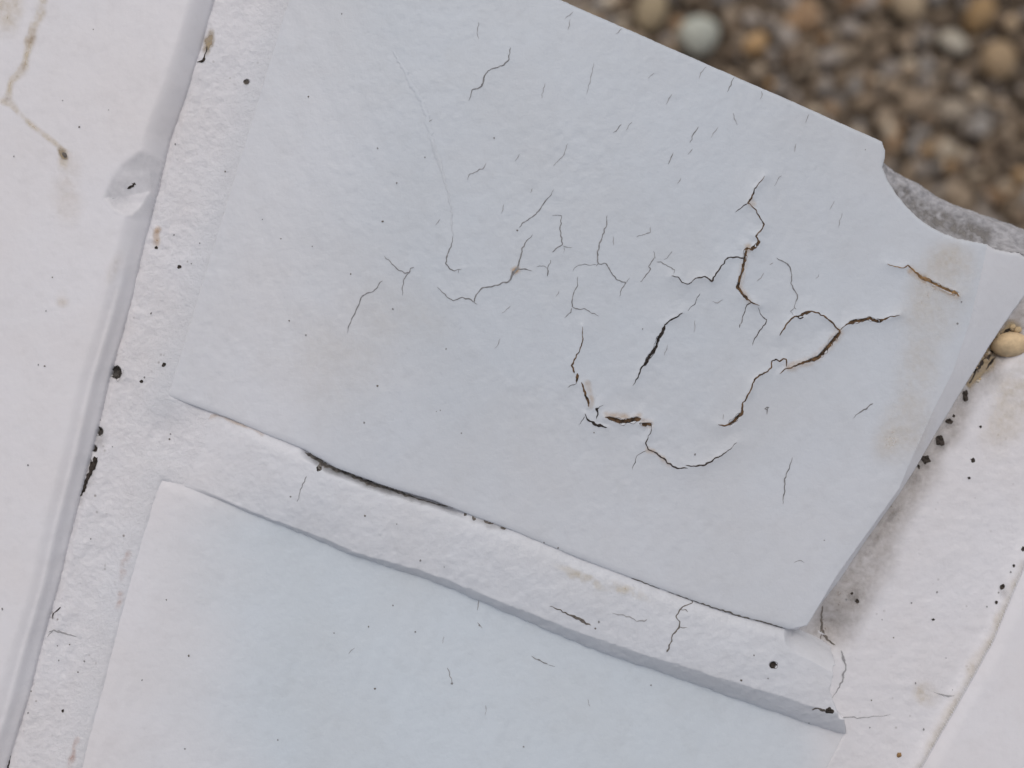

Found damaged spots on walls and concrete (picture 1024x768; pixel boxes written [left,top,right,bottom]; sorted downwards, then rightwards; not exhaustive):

peeling [198,35,213,63]
crack [347,257,414,332]
crack [436,176,899,469]
crack [888,264,960,297]
crack [632,578,783,652]